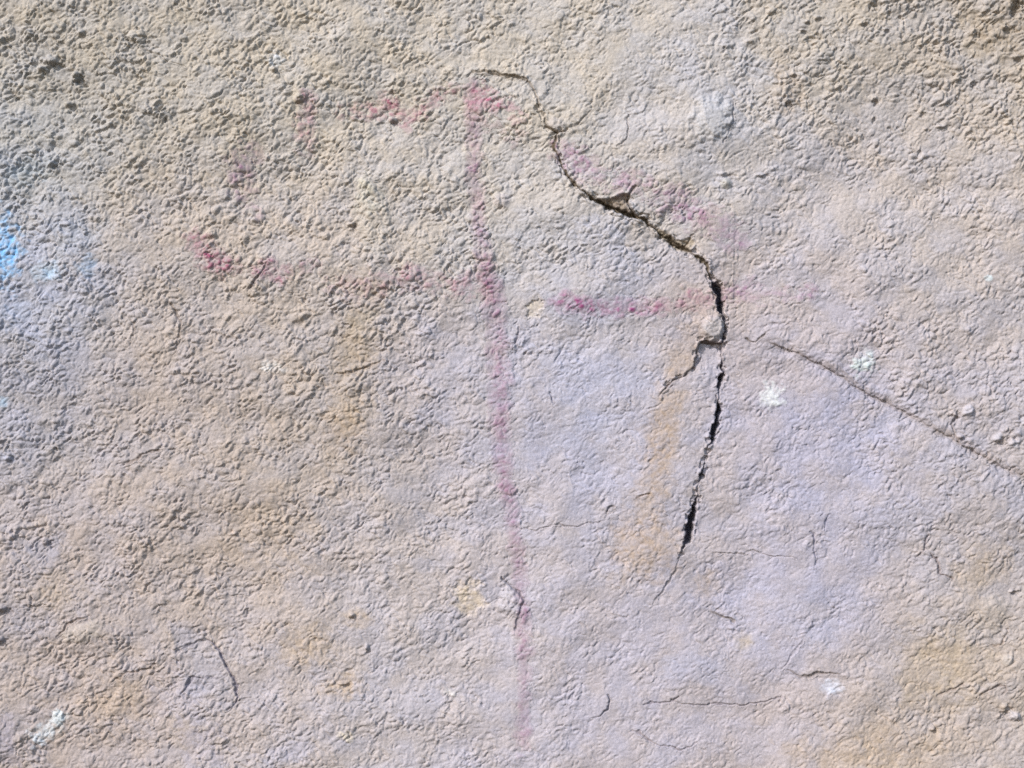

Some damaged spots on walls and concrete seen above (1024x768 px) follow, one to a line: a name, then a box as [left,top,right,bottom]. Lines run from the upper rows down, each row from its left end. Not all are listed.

crack [465,68,1024,605]